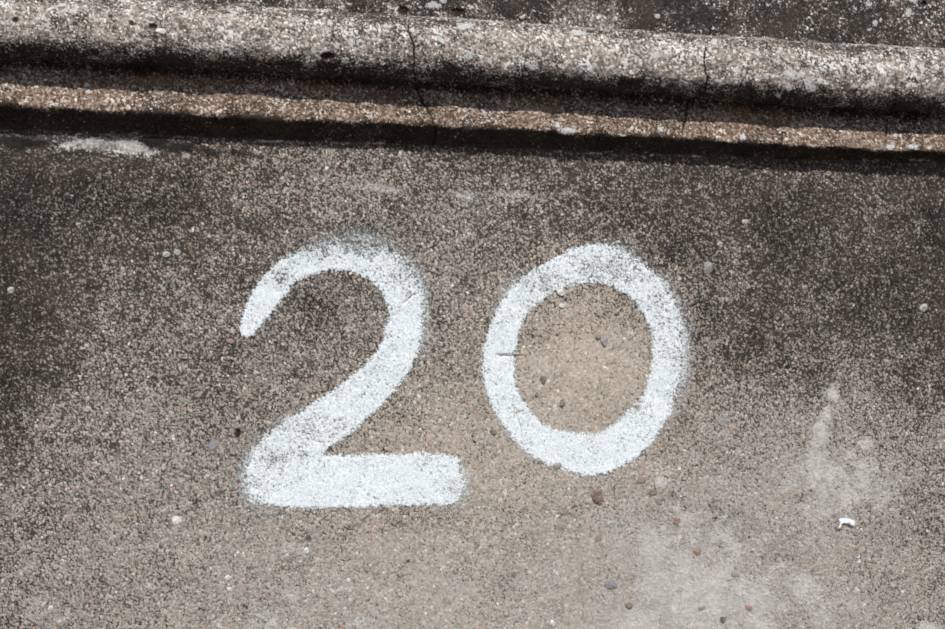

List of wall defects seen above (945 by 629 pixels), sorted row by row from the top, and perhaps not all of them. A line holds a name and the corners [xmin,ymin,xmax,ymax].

crack [407,22,437,145]
crack [671,47,709,139]